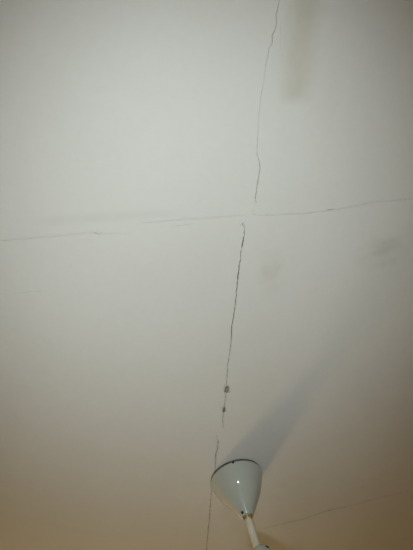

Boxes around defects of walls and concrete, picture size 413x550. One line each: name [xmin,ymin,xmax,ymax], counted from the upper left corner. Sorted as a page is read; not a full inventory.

crack [214,0,413,472]